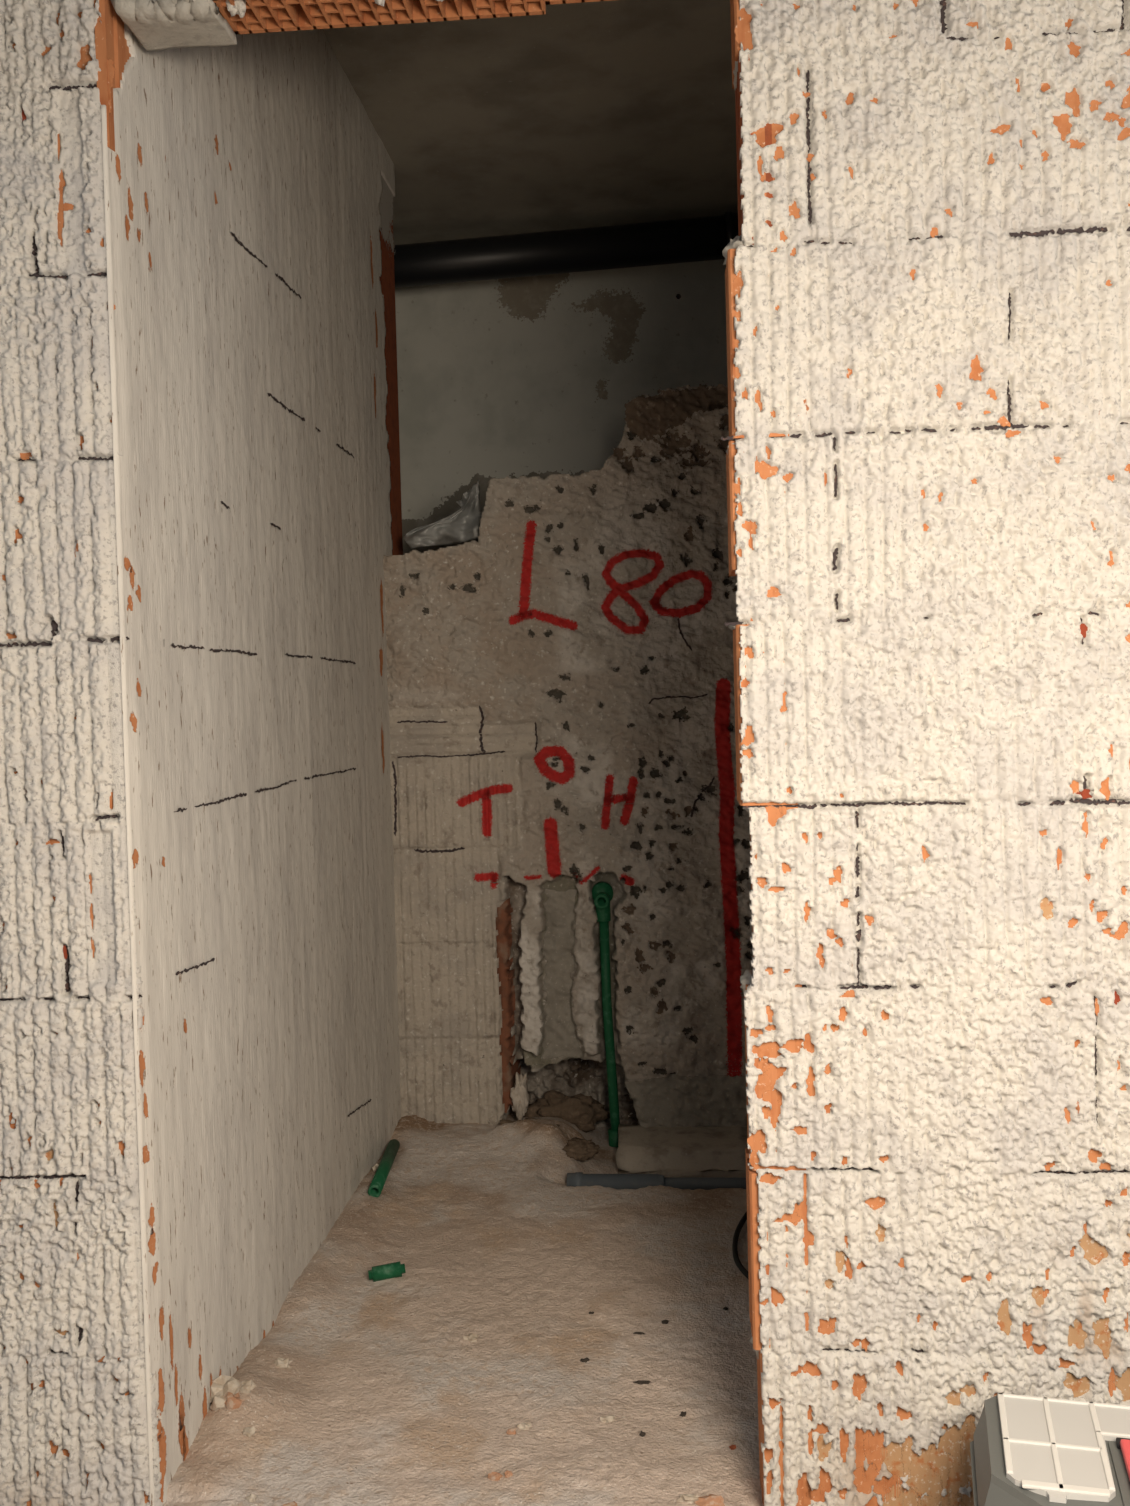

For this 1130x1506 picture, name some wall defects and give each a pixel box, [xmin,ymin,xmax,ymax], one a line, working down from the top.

flaking render [747,990,855,1184]
flaking render [764,1448,774,1494]
flaking render [791,1361,998,1506]